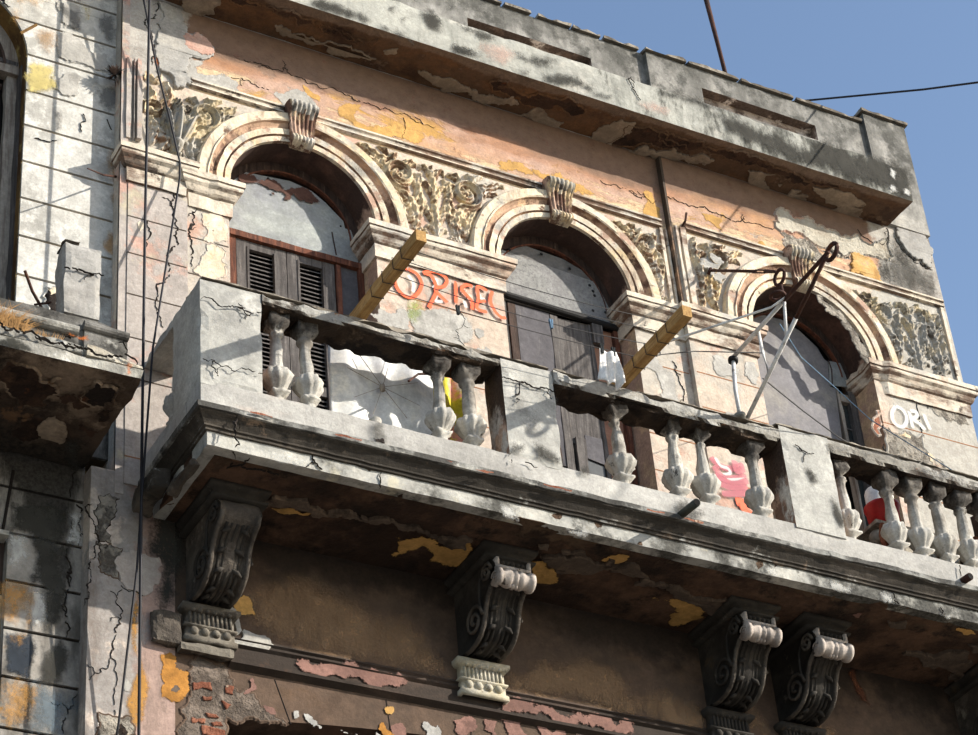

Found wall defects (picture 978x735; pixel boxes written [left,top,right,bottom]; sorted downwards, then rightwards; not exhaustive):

damp [422,11,442,31]
damp [520,54,609,98]
damp [724,118,913,197]
crack [600,180,774,230]
spalling [590,119,894,281]
crack [146,194,197,327]
crack [201,296,264,320]
crack [51,469,143,733]
damp [40,640,68,684]
spalling [160,652,322,735]
peeling [296,658,409,687]
peeling [454,696,634,735]